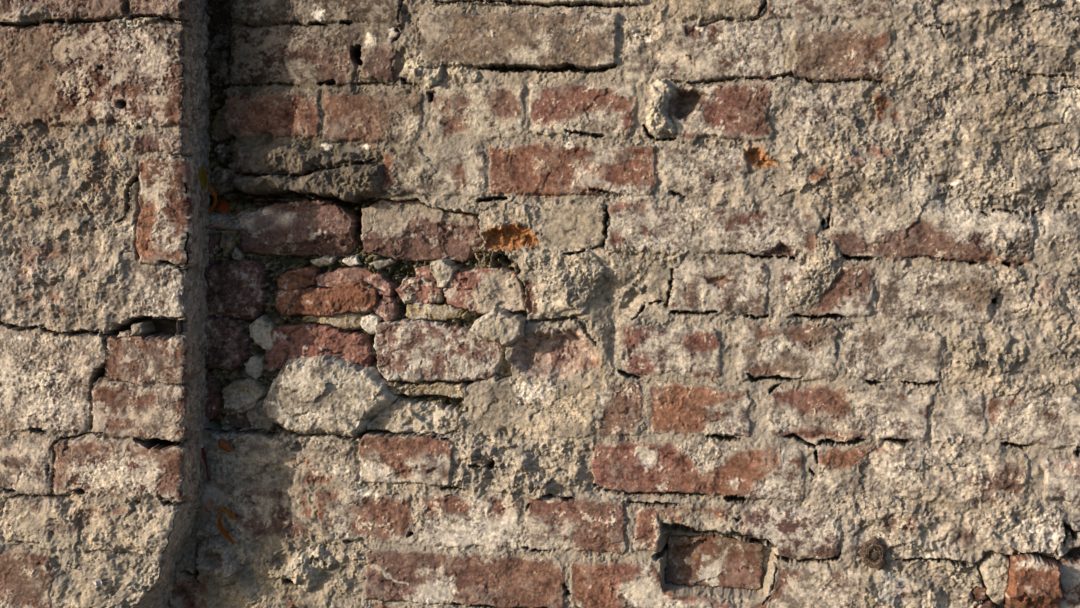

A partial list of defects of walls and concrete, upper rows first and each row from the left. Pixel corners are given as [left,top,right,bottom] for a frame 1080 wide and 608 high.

peeling [131,62,193,268]
crack [563,205,610,256]
peeling [8,239,95,317]
peeling [203,0,1061,608]
crack [631,268,675,321]
peeling [12,336,188,545]
peeling [169,548,224,608]